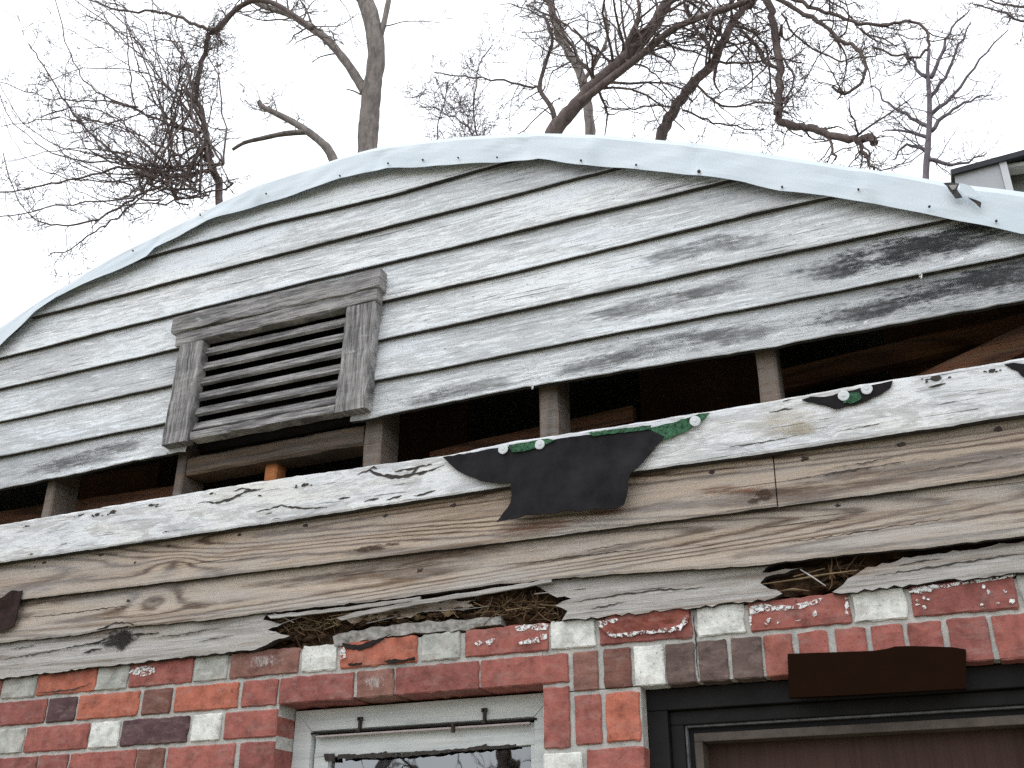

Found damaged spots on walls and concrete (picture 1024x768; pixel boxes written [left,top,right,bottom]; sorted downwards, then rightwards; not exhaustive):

leakage [644,233,771,264]
mould [791,224,1013,280]
leakage [591,280,743,321]
mould [808,259,1024,327]
leakage [557,323,774,376]
crack [199,464,443,514]
spalling [333,616,506,666]